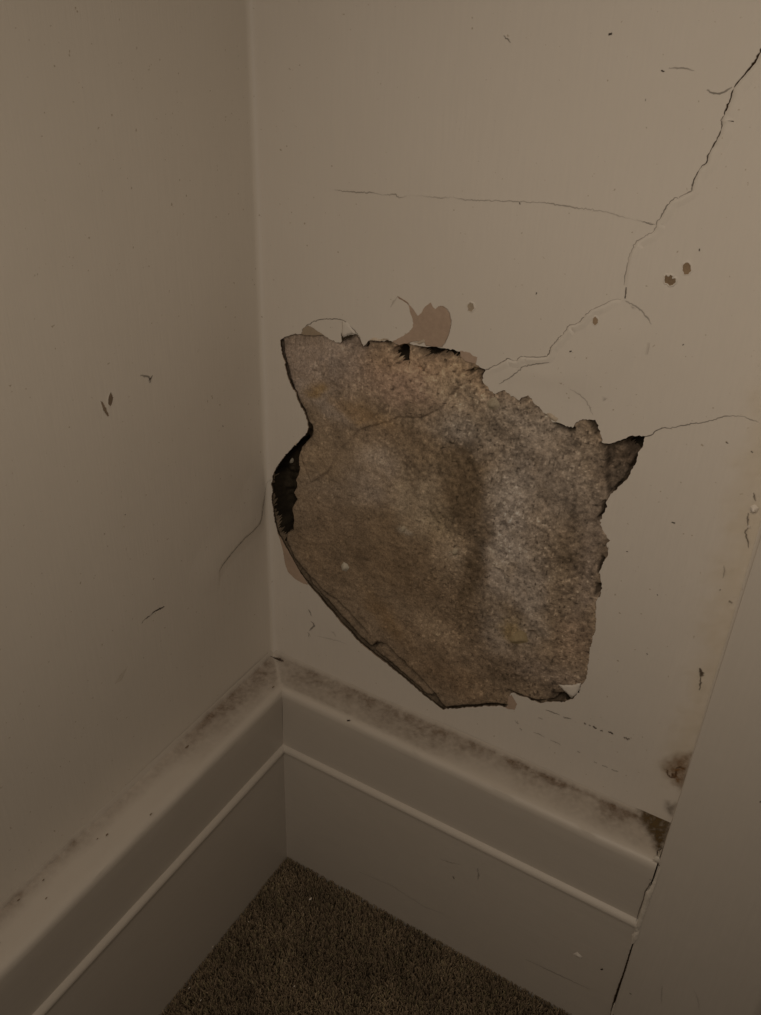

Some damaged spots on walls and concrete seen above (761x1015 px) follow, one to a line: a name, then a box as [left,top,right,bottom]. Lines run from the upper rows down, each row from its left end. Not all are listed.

crack [486,49,761,374]
spalling [271,297,645,710]
crack [610,848,662,1015]
leakage [642,810,670,848]